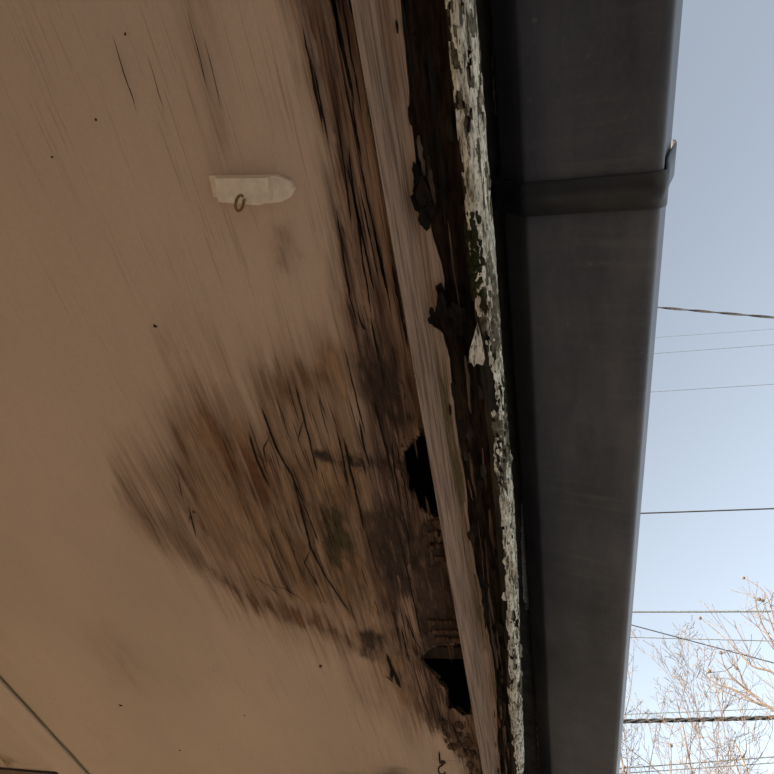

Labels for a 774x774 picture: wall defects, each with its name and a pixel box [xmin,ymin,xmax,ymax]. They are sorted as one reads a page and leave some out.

leakage [130,337,460,725]
crack [249,407,349,611]
crack [295,385,318,474]
crack [302,0,482,774]
peeling [439,0,529,774]